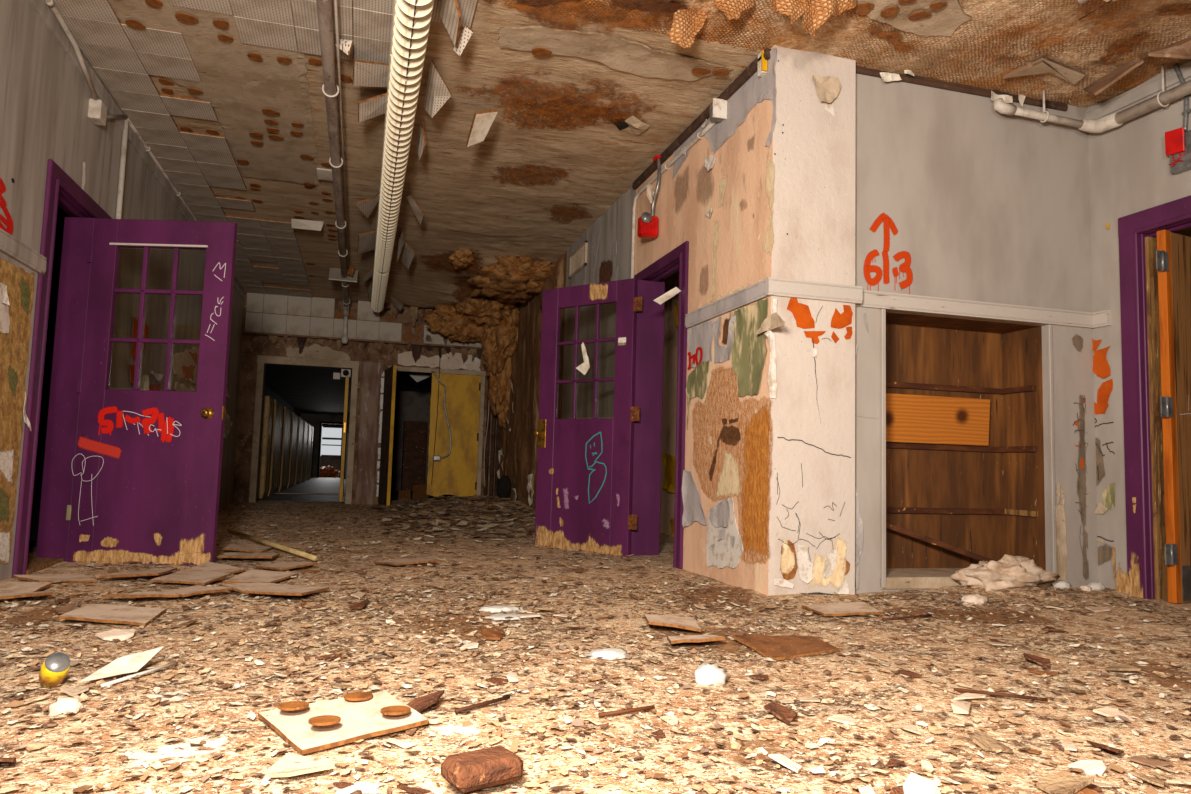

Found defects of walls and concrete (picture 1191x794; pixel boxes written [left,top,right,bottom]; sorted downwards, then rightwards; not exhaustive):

spalling [0,258,35,564]
peeling [497,449,534,506]
spalling [663,454,743,568]
peeling [674,302,736,430]
peeling [756,298,869,398]
crack [776,306,851,557]
spalling [774,486,863,594]
peeling [1084,338,1113,414]